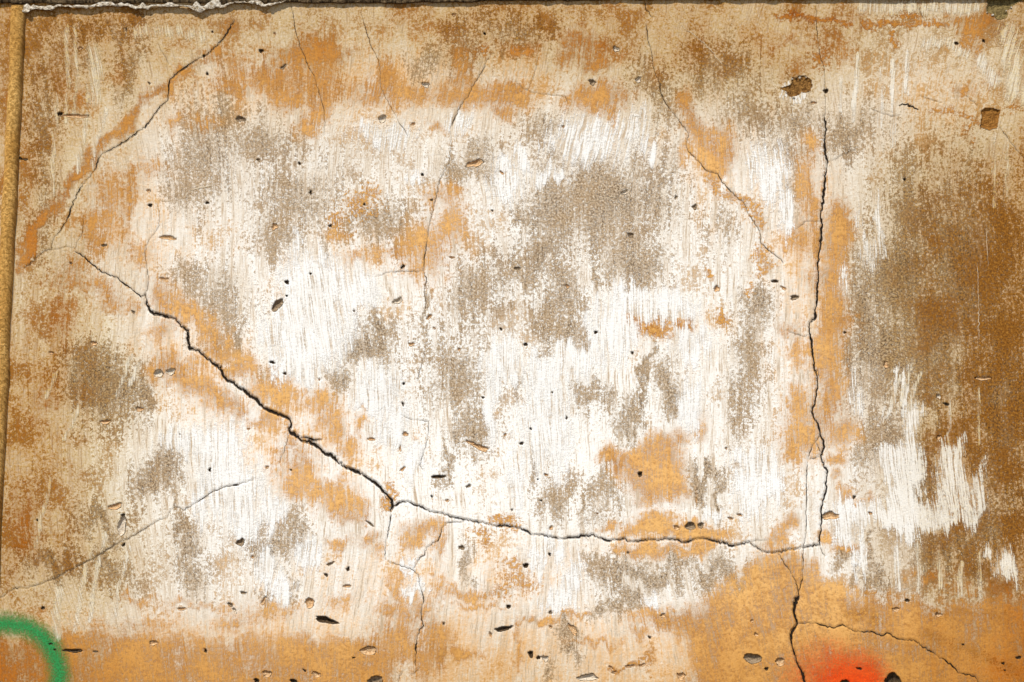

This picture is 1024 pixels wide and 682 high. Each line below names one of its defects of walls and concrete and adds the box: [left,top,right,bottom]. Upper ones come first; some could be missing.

peeling [402,2,567,88]
peeling [857,0,1024,107]
crack [26,21,234,266]
crack [75,4,852,682]
peeling [156,28,1024,670]
crack [0,480,252,598]
crack [817,623,977,679]